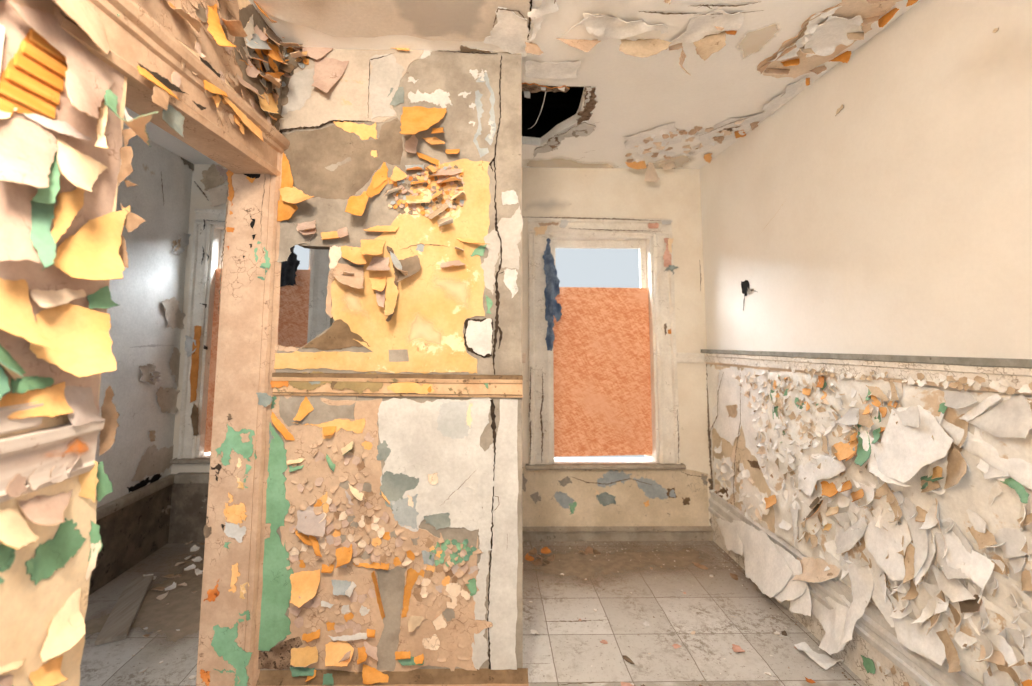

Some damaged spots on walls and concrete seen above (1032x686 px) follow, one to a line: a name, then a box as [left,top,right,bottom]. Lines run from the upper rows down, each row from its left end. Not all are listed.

crack [493,0,556,40]
peeling [556,0,764,75]
flaking render [533,86,598,158]
peeling [623,0,918,182]
peeling [134,0,581,375]
peeling [530,217,672,236]
spalling [741,280,757,311]
peeling [0,0,264,686]
crack [438,50,508,669]
peeling [200,364,1032,686]
crack [538,597,602,622]
crack [531,663,609,685]